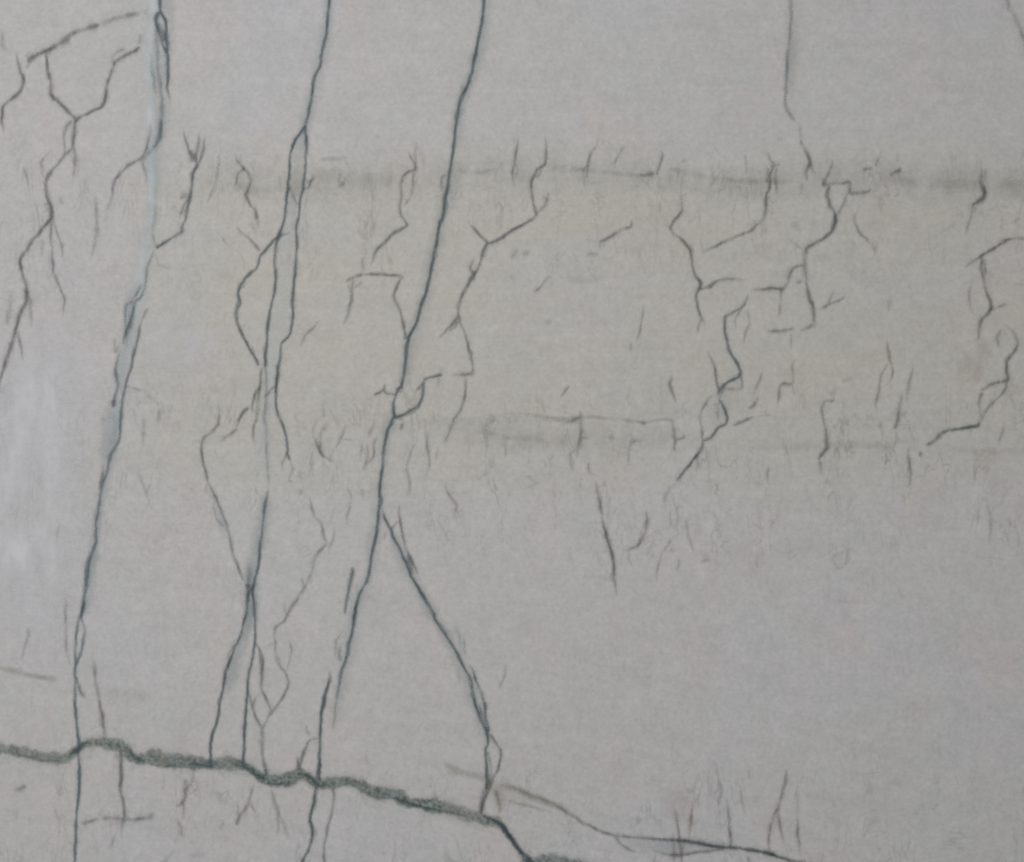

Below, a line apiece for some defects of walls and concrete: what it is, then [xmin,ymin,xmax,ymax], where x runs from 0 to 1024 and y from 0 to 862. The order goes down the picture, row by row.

crack [46,58,107,137]
crack [135,0,169,128]
crack [15,202,52,330]
crack [237,0,330,456]
crack [103,227,182,482]
crack [348,0,580,862]
crack [680,308,741,476]
crack [5,544,454,862]
crack [652,816,794,862]